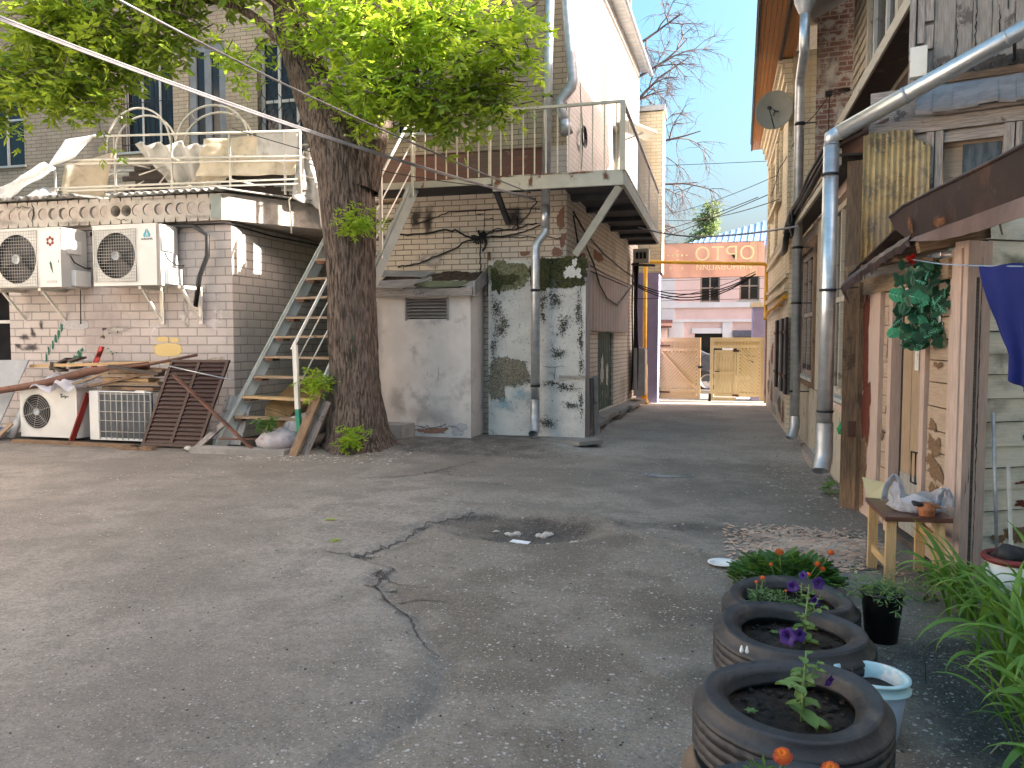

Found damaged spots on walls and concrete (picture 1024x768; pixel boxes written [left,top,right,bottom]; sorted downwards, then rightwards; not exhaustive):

water stain [486,255,588,295]
flaking render [415,423,468,436]
peeling [926,417,944,492]
crack [351,512,474,657]